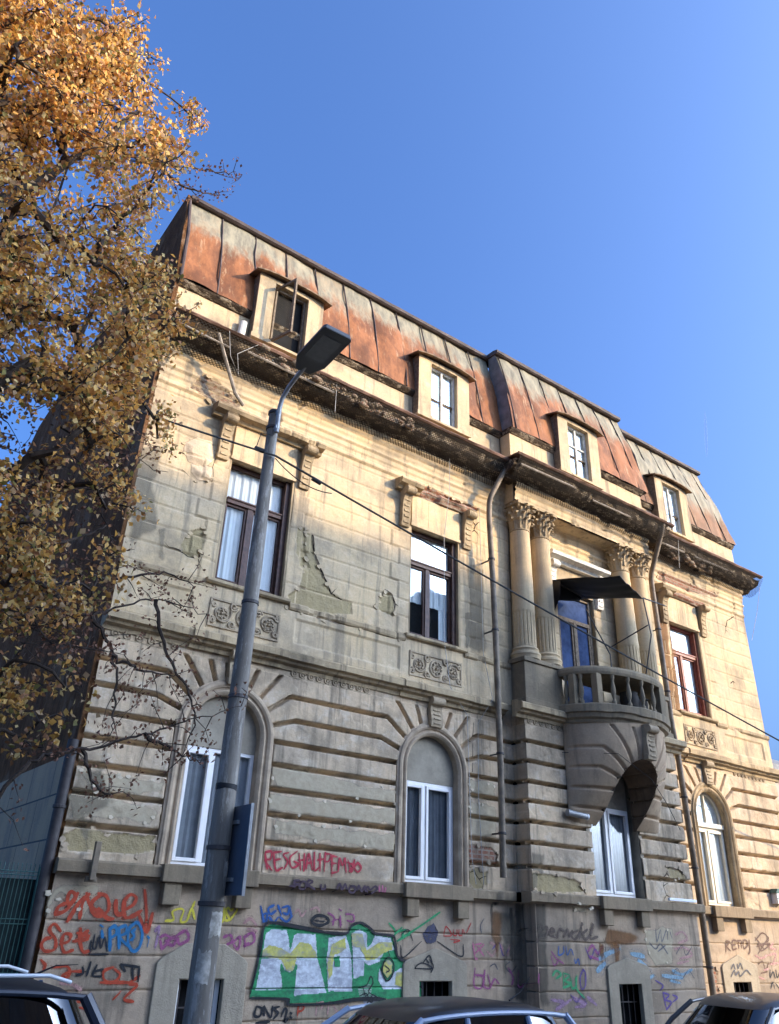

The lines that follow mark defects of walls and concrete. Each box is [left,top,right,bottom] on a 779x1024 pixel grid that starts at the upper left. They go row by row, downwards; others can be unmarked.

flaking render [178,525,207,559]
flaking render [284,527,362,631]
flaking render [373,590,398,616]
peeling [468,780,500,889]
flaking render [532,873,594,912]